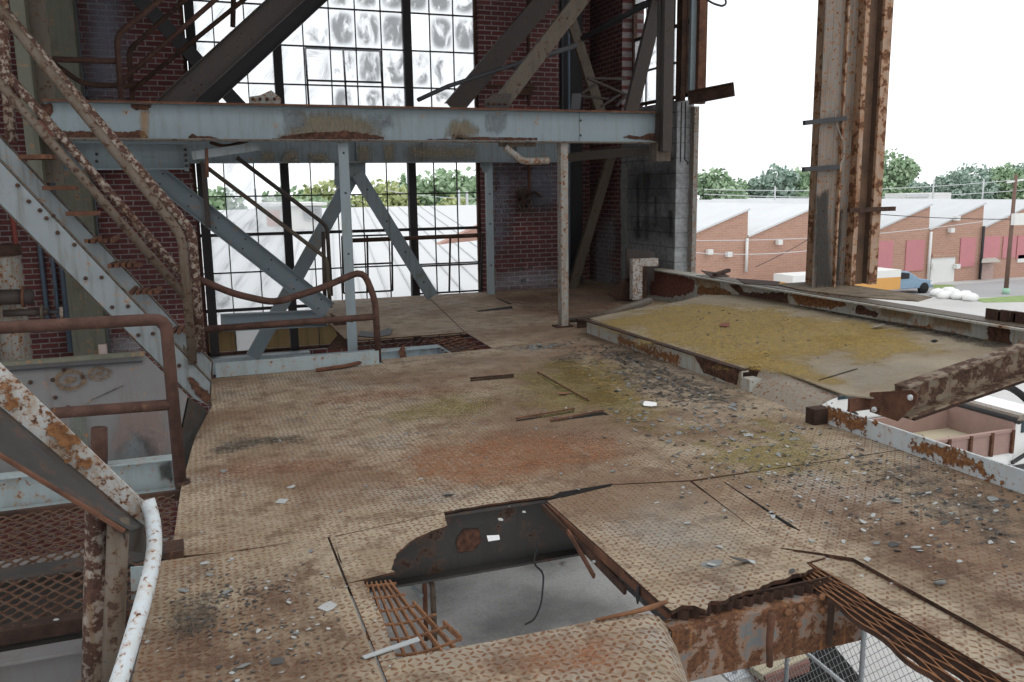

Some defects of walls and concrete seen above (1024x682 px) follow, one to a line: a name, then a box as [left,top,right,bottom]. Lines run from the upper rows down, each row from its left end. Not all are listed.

corrosion [38,99,97,141]
corrosion [87,100,657,138]
corrosion [618,334,681,365]
corrosion [0,380,31,412]
corrosion [823,401,878,437]
corrosion [44,408,105,482]
corrosion [907,436,1004,487]